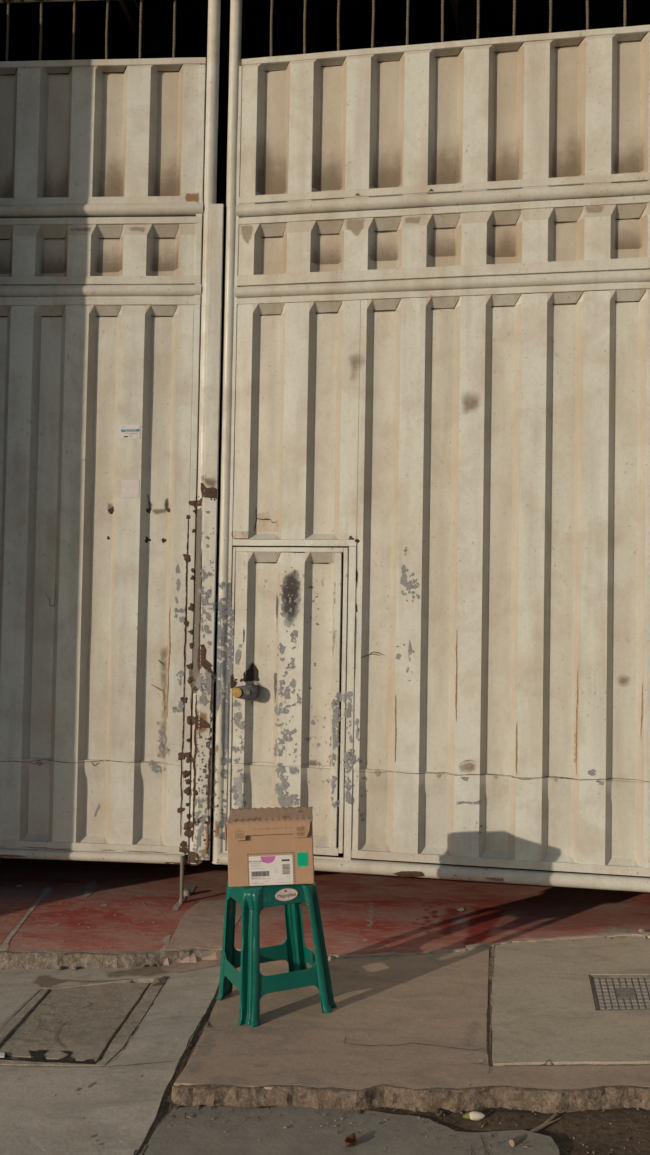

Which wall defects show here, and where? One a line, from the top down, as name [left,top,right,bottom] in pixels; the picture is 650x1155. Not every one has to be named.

rust [146,496,170,514]
rust [150,611,170,773]
rust [165,479,219,865]
peeling [174,507,246,860]
peeling [273,567,368,821]
peeling [400,547,420,602]